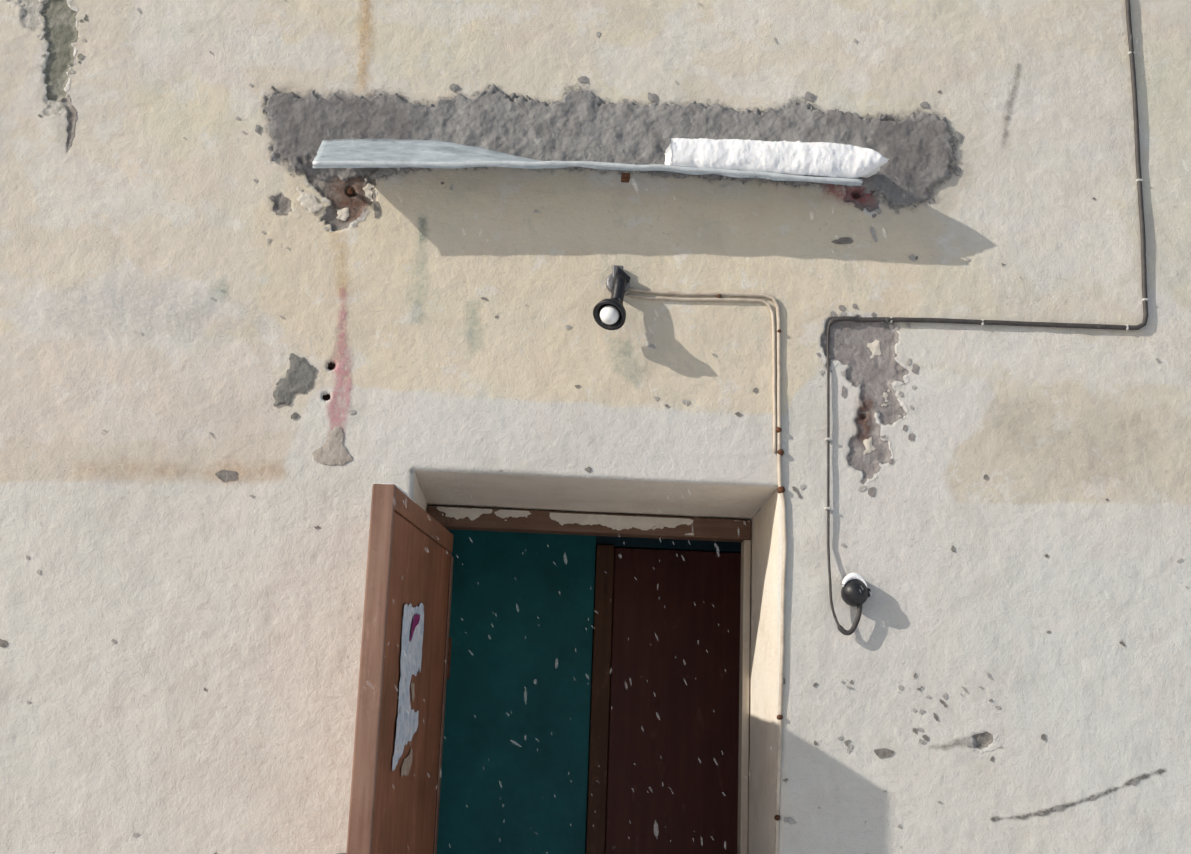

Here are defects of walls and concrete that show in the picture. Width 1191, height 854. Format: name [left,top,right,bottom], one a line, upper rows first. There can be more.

spalling [6,0,88,153]
spalling [830,184,882,242]
spalling [816,303,919,496]
spalling [898,673,1002,762]